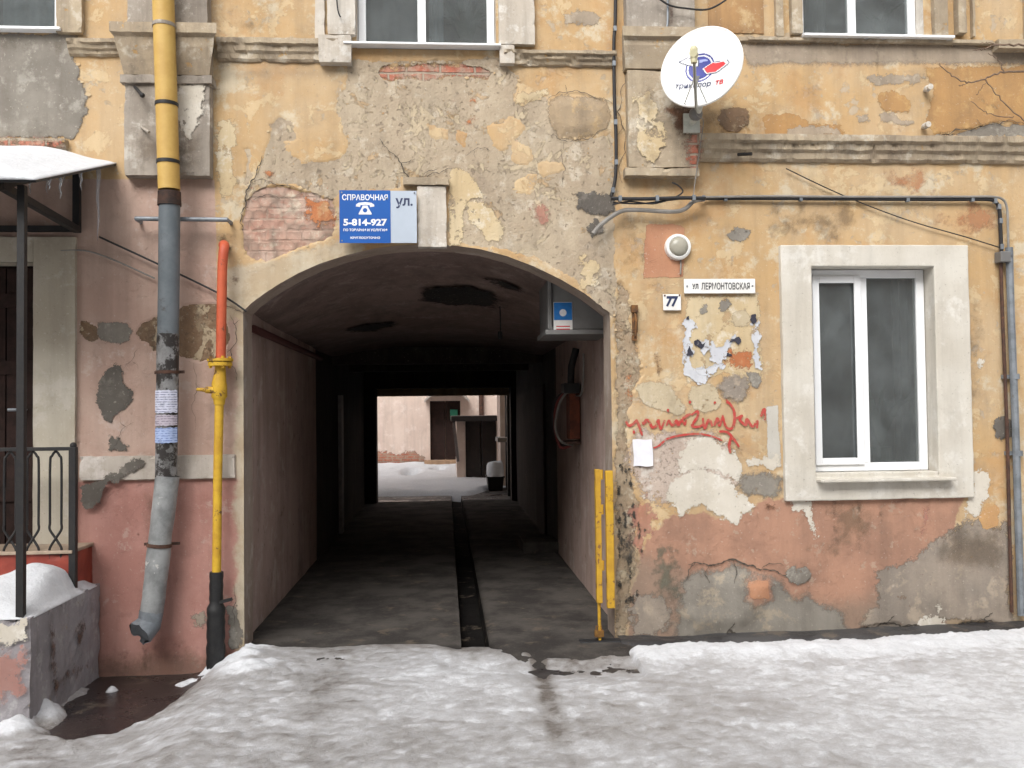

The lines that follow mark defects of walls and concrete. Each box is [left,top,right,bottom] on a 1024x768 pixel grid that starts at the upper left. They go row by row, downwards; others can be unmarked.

peeling [177,84,206,140]
crack [942,120,1024,136]
flaking render [79,321,99,342]
flaking render [136,317,157,351]
flaking render [179,304,230,362]
flaking render [214,56,764,638]
peeling [978,501,1000,530]
crack [683,558,787,583]
peeling [748,580,770,599]
flaking render [917,604,946,626]